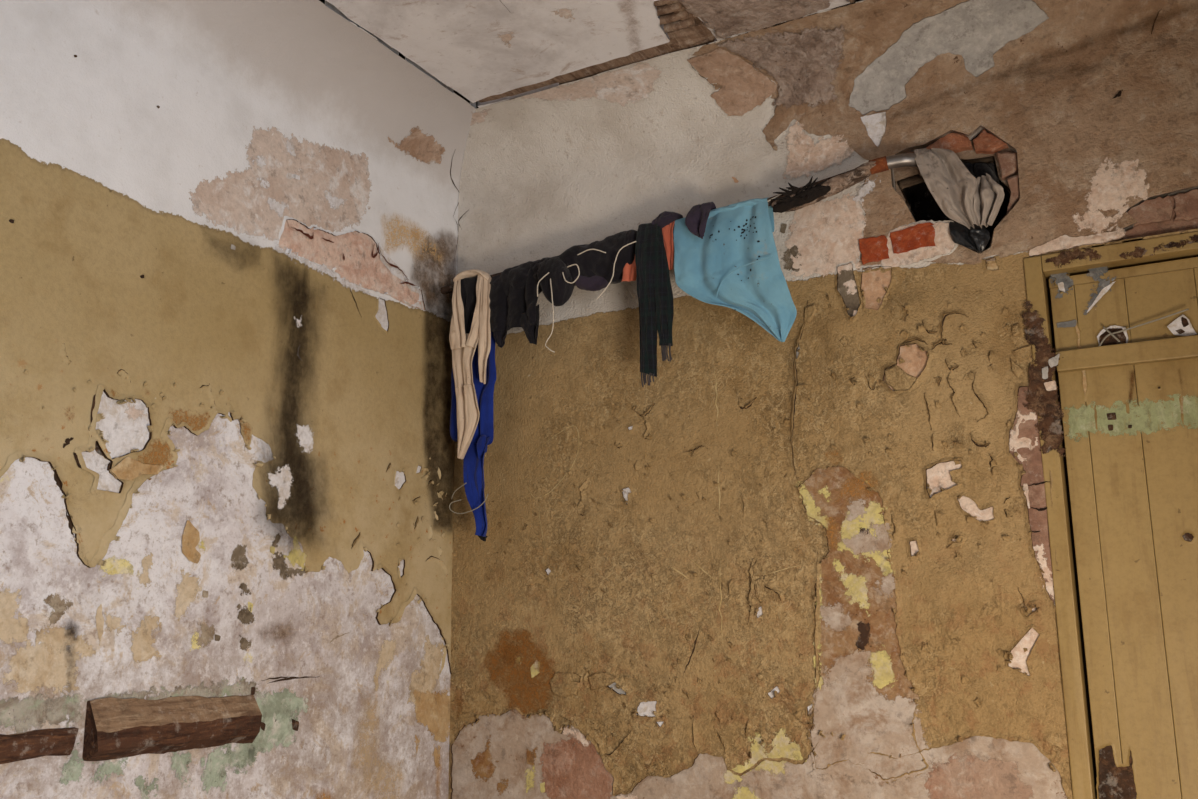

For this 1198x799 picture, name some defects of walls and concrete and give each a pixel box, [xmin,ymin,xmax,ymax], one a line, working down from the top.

peeling [189,126,427,334]
flaking render [680,0,1198,347]
peeling [0,380,1073,799]
peeling [867,324,936,397]
crack [898,306,1048,533]
flaking render [997,354,1198,679]
peeling [1096,742,1139,799]